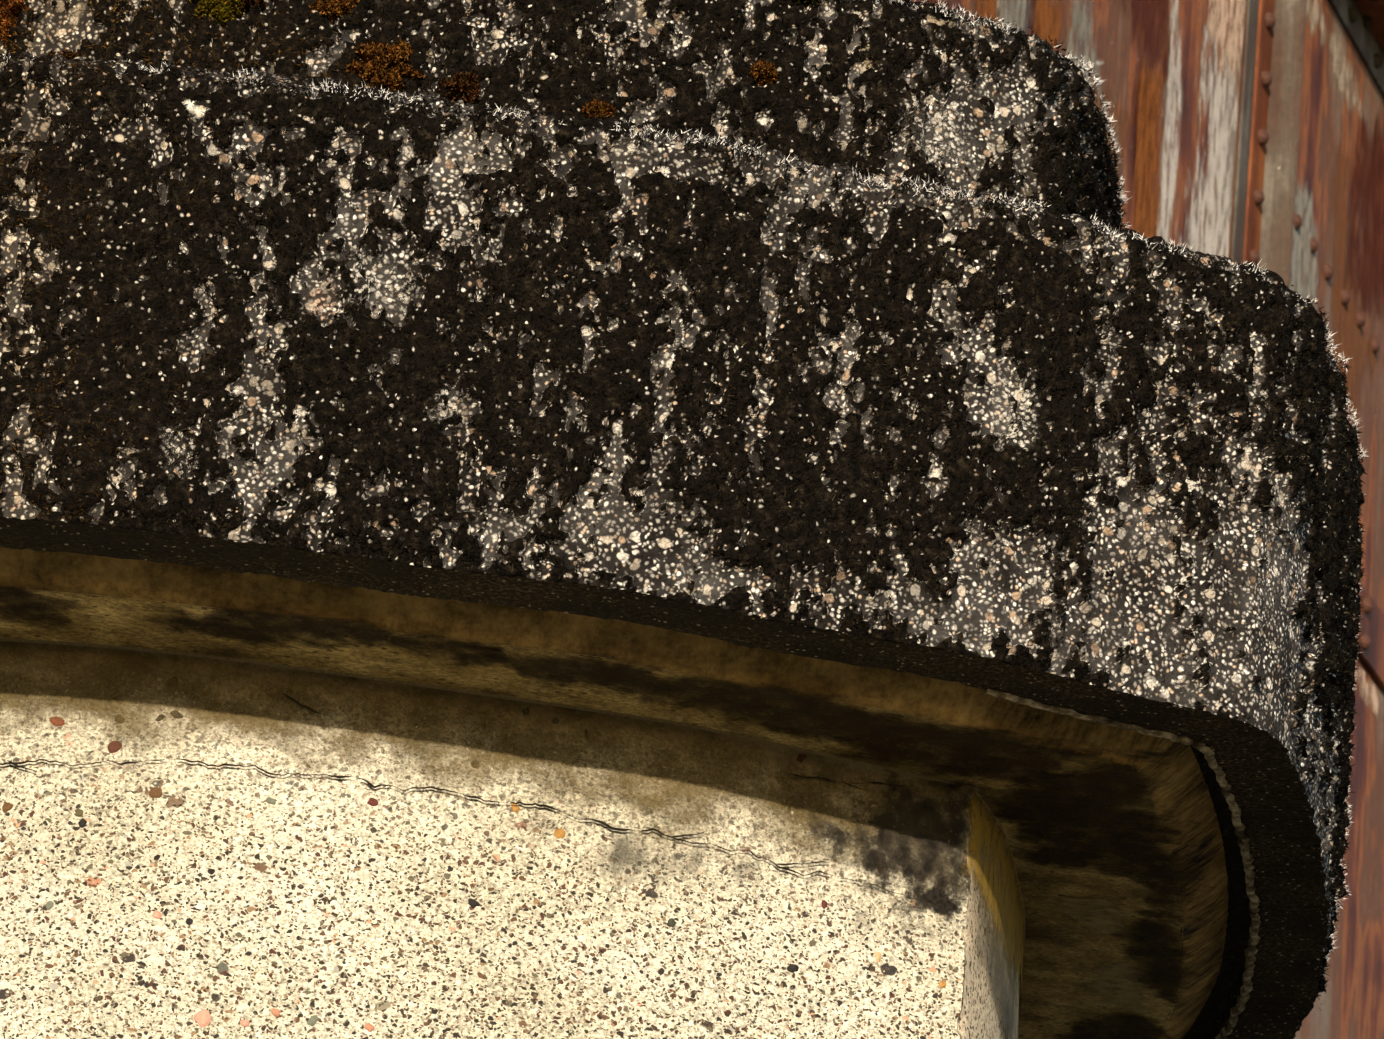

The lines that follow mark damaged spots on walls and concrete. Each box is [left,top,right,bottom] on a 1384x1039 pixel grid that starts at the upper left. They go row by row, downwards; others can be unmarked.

corrosion [1034,0,1062,51]
corrosion [1093,0,1169,238]
corrosion [1328,149,1377,423]
leakage [0,585,74,628]
leakage [148,606,1214,1004]
leakage [979,937,1017,1039]
leakage [1060,1015,1172,1039]